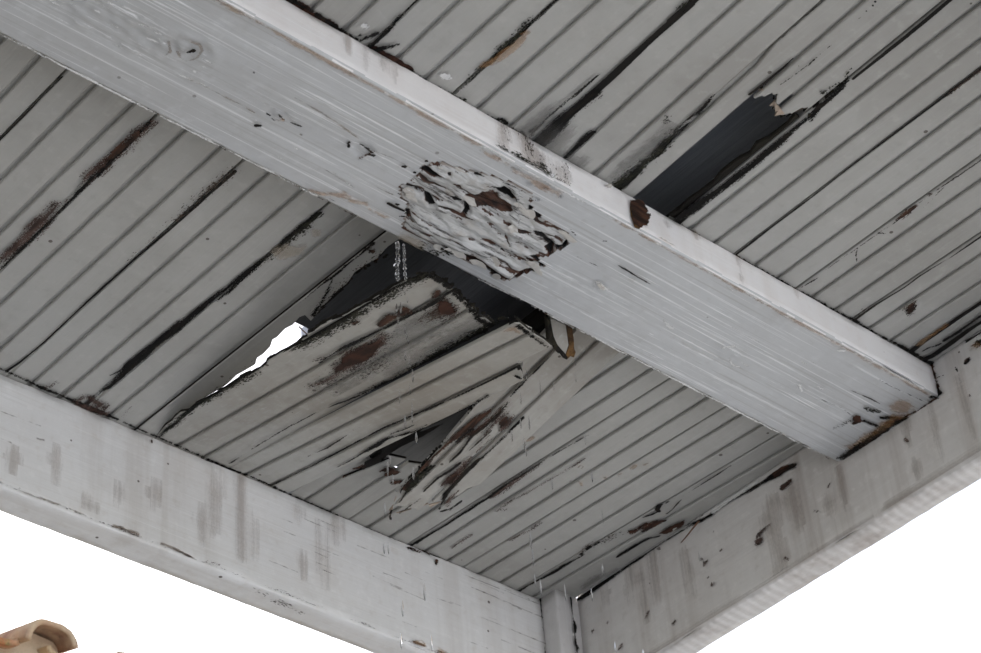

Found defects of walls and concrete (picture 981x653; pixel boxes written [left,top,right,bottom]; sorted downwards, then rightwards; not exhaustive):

leakage [0,119,159,270]
peeling [403,187,418,203]
peeling [420,234,487,269]
peeling [514,203,535,219]
leakage [0,210,549,535]
crack [399,402,508,503]
peeling [440,413,515,508]